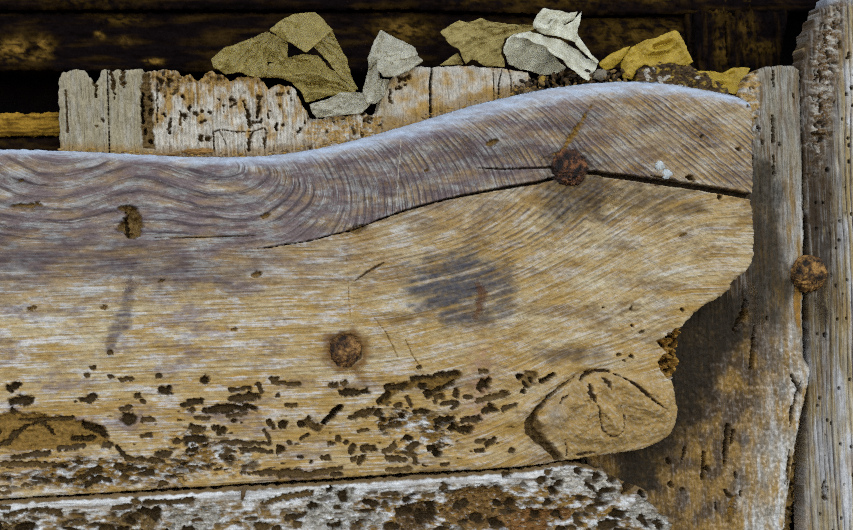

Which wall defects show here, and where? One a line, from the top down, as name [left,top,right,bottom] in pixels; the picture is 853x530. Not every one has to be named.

crack [154,167,554,250]
crack [585,170,751,199]